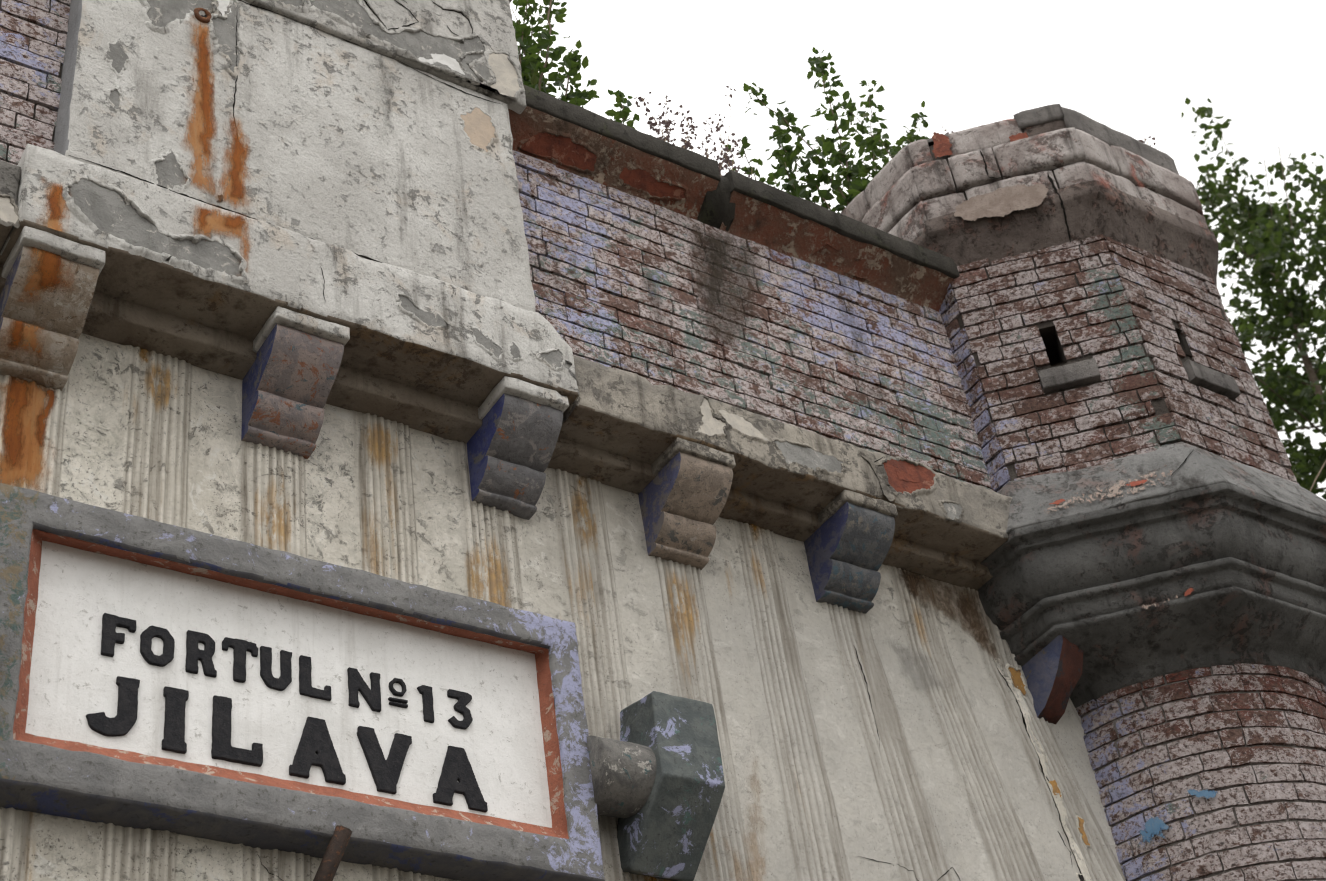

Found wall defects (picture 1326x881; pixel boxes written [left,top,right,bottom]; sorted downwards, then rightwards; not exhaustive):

peeling [103,41,132,112]
peeling [138,0,245,80]
crack [233,0,500,138]
peeling [271,0,525,101]
peeling [60,173,249,285]
peeling [148,149,192,192]
corrosion [186,23,249,259]
flaking render [954,184,1048,221]
leakage [694,228,758,343]
corrosion [4,320,42,358]
corrosion [0,377,56,486]
spalling [877,455,965,523]